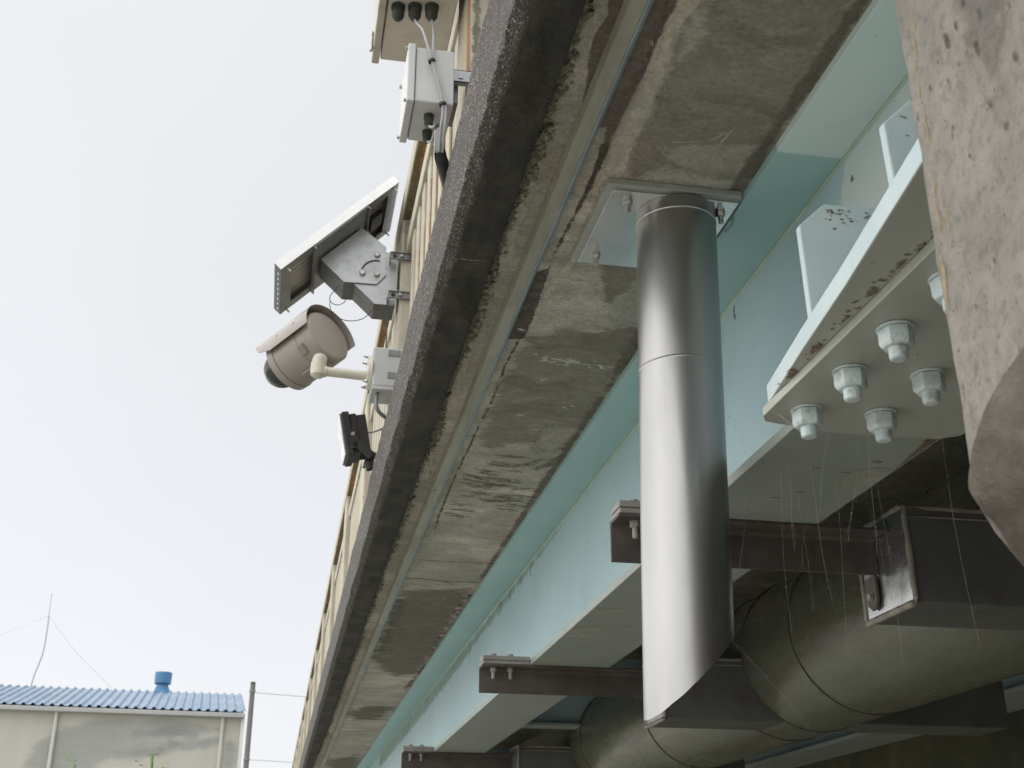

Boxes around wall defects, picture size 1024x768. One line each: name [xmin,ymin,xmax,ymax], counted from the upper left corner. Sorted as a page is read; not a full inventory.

water stain [555,0,867,253]
corrosion [804,231,934,360]
water stain [372,584,469,677]